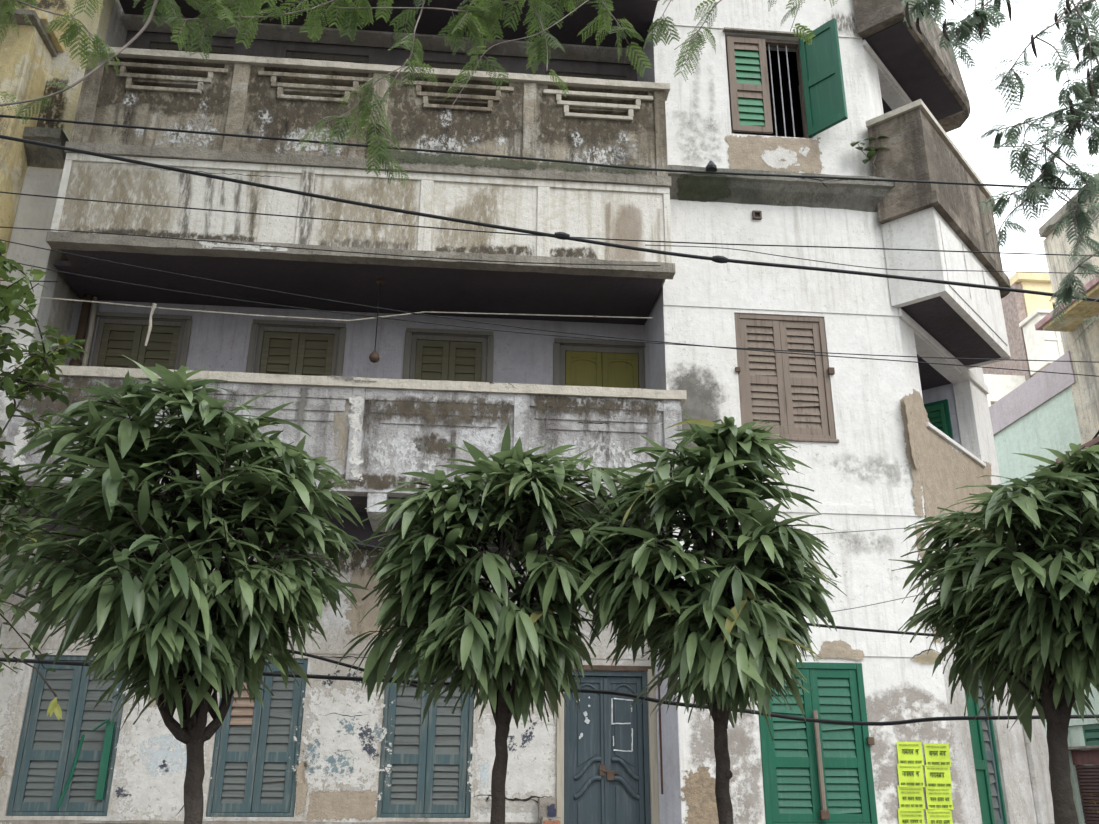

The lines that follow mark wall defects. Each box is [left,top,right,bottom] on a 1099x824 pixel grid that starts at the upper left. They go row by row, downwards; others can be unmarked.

water stain [374,125,651,174]
spalling [726,135,823,173]
water stain [61,165,259,242]
water stain [321,179,415,249]
water stain [323,397,512,490]
water stain [534,395,661,461]
water stain [672,369,720,457]
peeling [816,640,864,660]
peeling [0,650,22,784]
peeling [289,669,395,821]
spalling [681,697,719,824]
peeling [728,704,762,824]